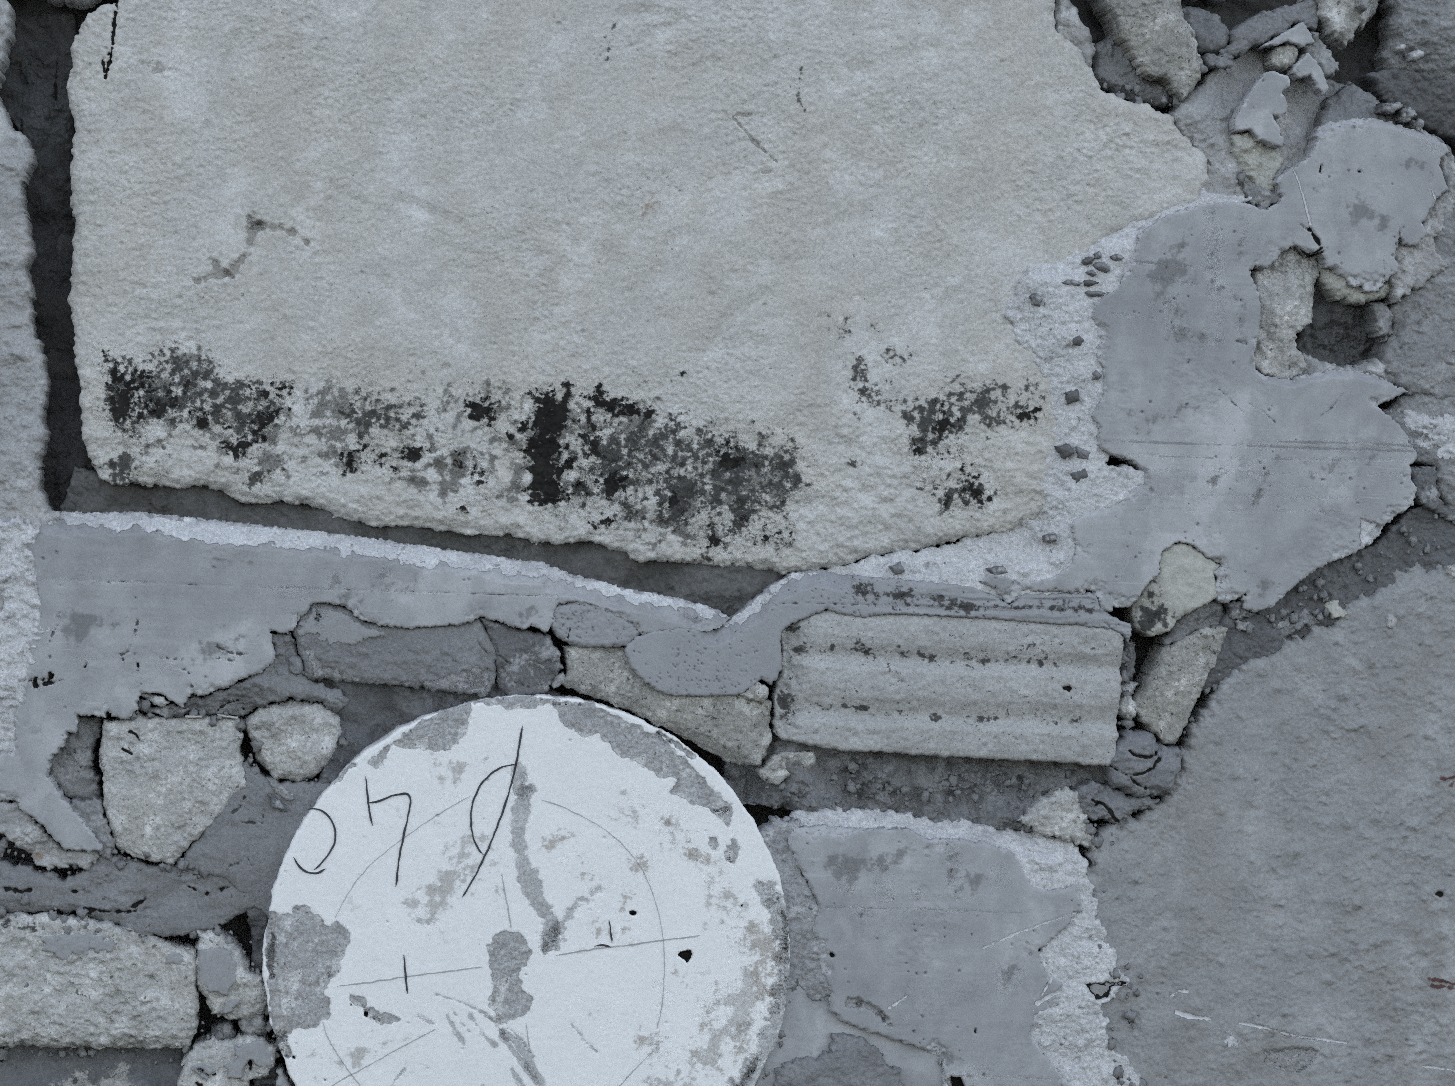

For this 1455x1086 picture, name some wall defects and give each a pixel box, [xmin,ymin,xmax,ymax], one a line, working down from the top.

crack [52,61,60,101]
crack [101,1,119,79]
peeling [1229,22,1329,149]
spalling [1374,101,1424,131]
water stain [84,333,812,566]
spalling [0,188,1252,754]
water stain [828,315,1045,518]
spalling [1360,519,1378,548]
peeling [332,666,740,863]
spalling [726,806,1141,1086]